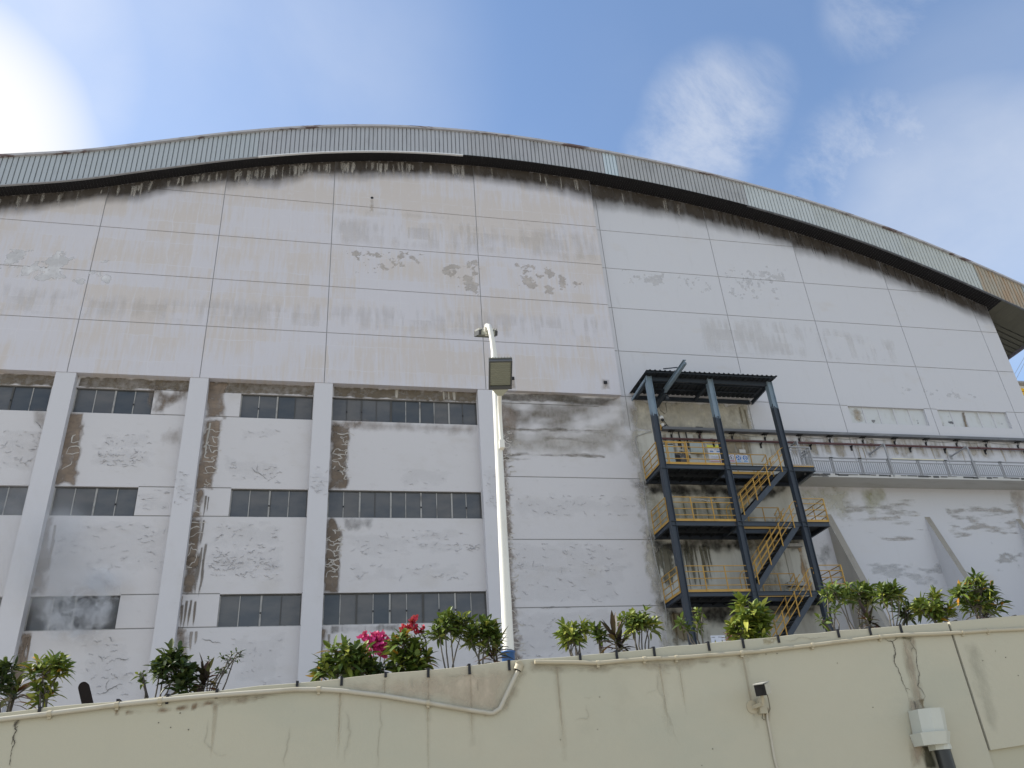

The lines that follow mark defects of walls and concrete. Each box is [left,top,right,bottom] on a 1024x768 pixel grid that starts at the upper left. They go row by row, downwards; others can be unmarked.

leakage [0,161,991,318]
crack [63,434,80,469]
crack [187,428,221,568]
crack [332,433,353,480]
leakage [502,394,608,567]
crack [325,526,345,577]
leakage [510,583,520,660]
crack [889,639,925,710]